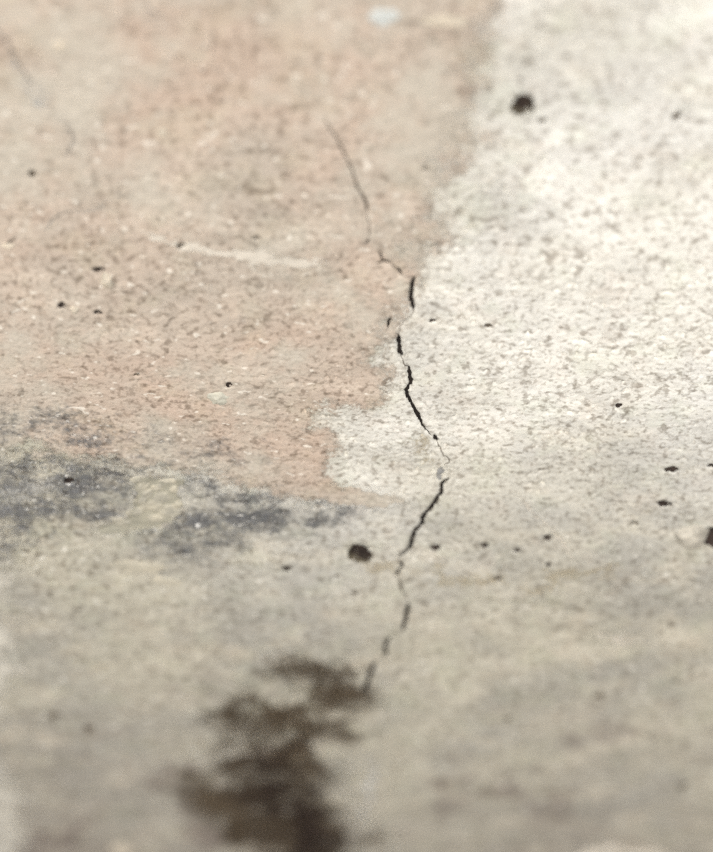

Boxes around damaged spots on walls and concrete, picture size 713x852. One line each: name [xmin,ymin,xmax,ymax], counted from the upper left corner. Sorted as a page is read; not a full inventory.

crack [325,118,450,693]
water stain [179,657,373,852]